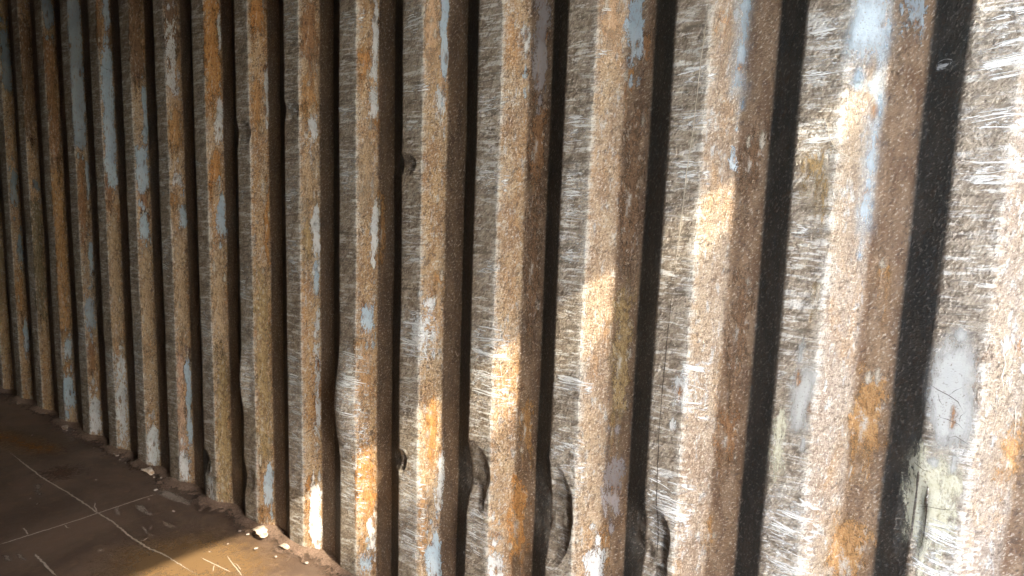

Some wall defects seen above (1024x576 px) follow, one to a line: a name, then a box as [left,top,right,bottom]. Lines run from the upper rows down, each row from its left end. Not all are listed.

peeling [622,0,645,88]
peeling [846,0,928,58]
corrosion [170,192,190,482]
corrosion [252,175,275,468]
corrosion [350,438,378,534]
corrosion [505,387,535,573]
corrosion [522,91,549,347]
corrosion [597,523,612,568]
corrosion [609,103,649,465]
corrosion [825,510,877,576]
corrosion [846,362,895,489]
peeling [928,329,976,472]